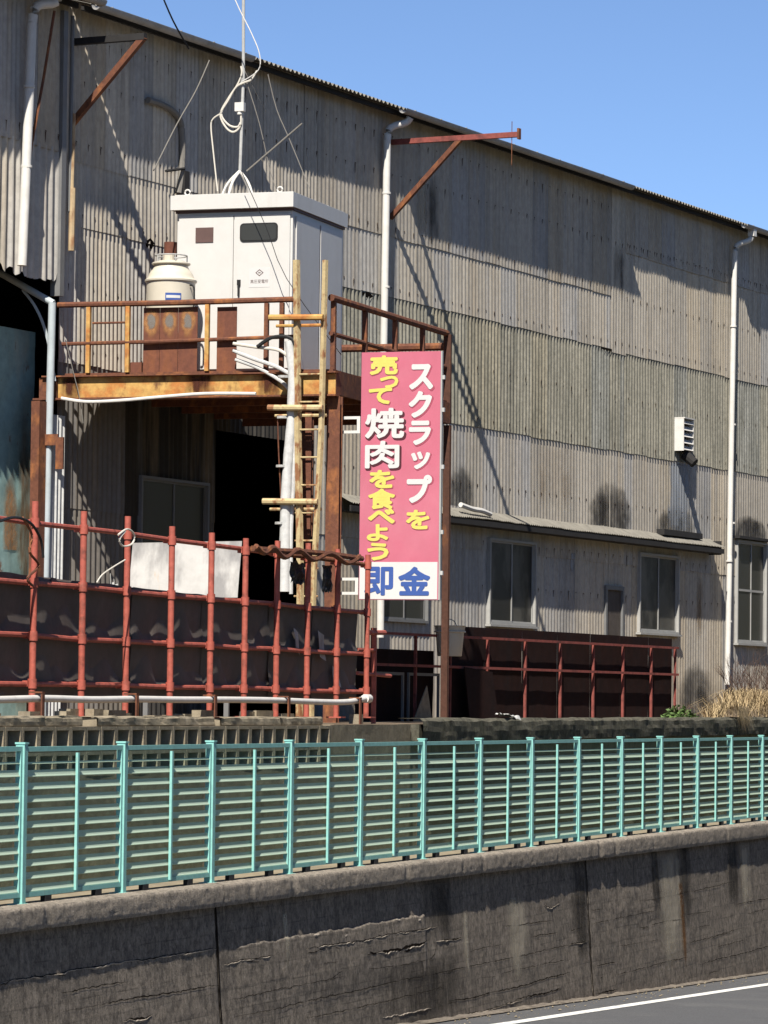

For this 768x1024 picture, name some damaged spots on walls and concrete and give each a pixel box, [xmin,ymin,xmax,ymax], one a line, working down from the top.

corrosion [63,378,79,394]
corrosion [189,376,210,392]
corrosion [262,375,278,392]
spalling [368,938,461,959]